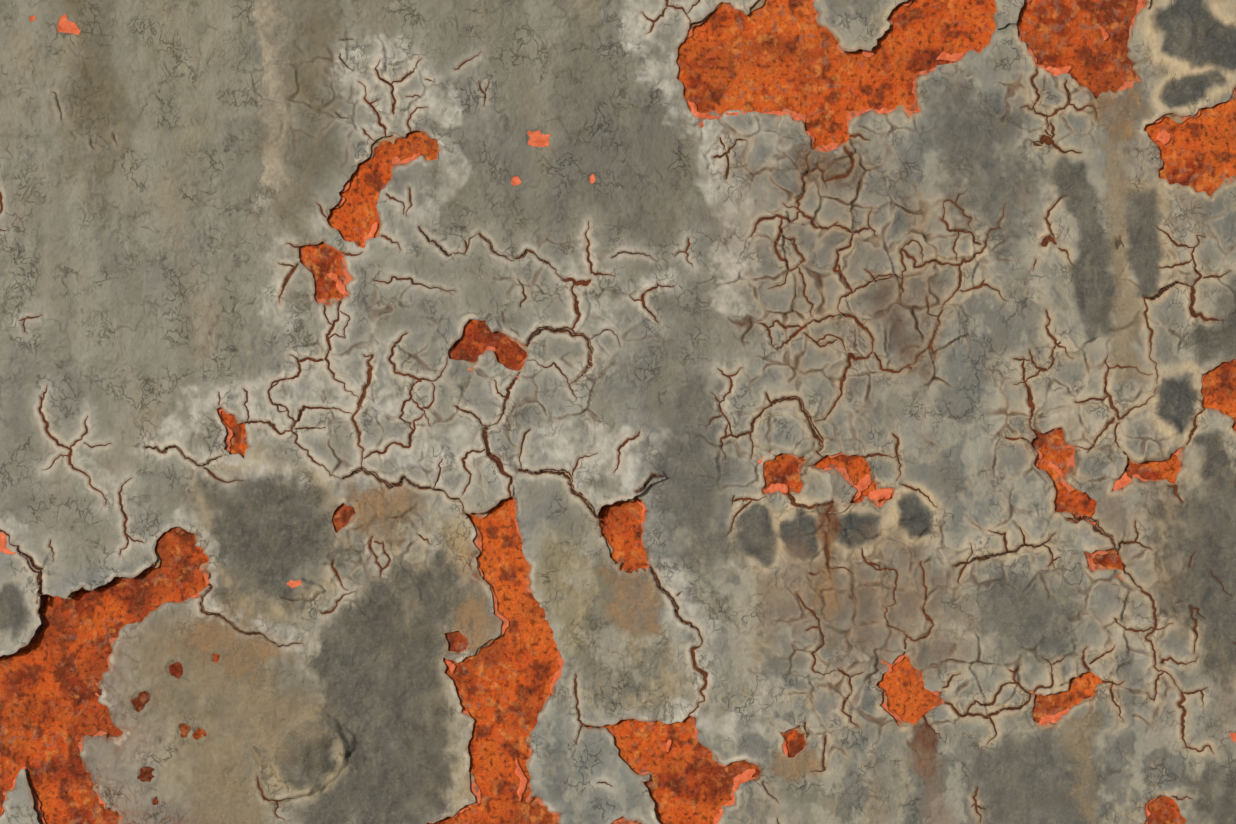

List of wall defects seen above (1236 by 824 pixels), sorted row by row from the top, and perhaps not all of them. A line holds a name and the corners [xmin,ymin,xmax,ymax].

peeling [676,0,1151,149]
crack [218,188,693,537]
crack [706,134,1006,460]
crack [1074,226,1232,450]
peeling [0,527,209,824]
corrosion [131,691,150,712]
corrosion [137,767,155,782]
corrosion [169,662,183,679]
corrosion [178,723,206,740]
peeling [427,450,561,824]
peeling [587,717,760,824]
crack [922,515,1214,754]